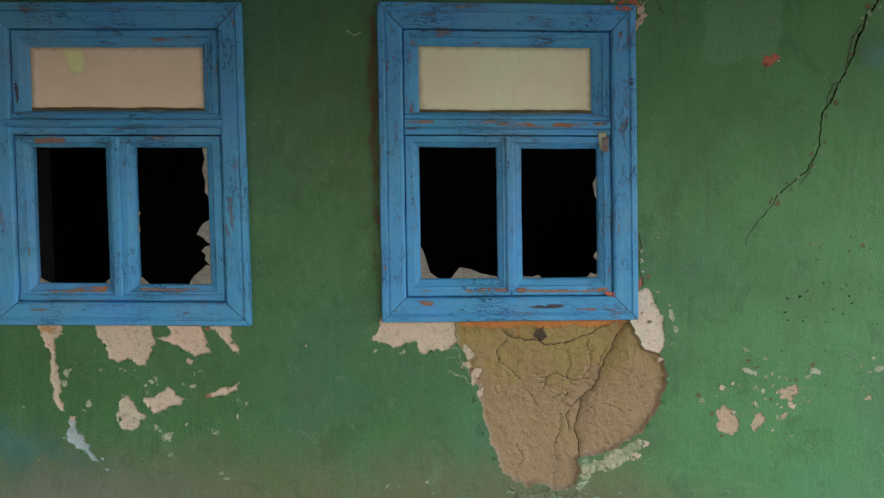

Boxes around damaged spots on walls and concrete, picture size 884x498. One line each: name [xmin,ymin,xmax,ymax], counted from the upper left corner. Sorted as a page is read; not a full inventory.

spalling [605,0,649,31]
spalling [762,54,780,68]
crack [746,0,882,245]
peeling [37,325,109,471]
peeling [95,325,240,457]
peeling [206,382,248,420]
spalling [370,233,679,498]
spalling [710,347,821,438]